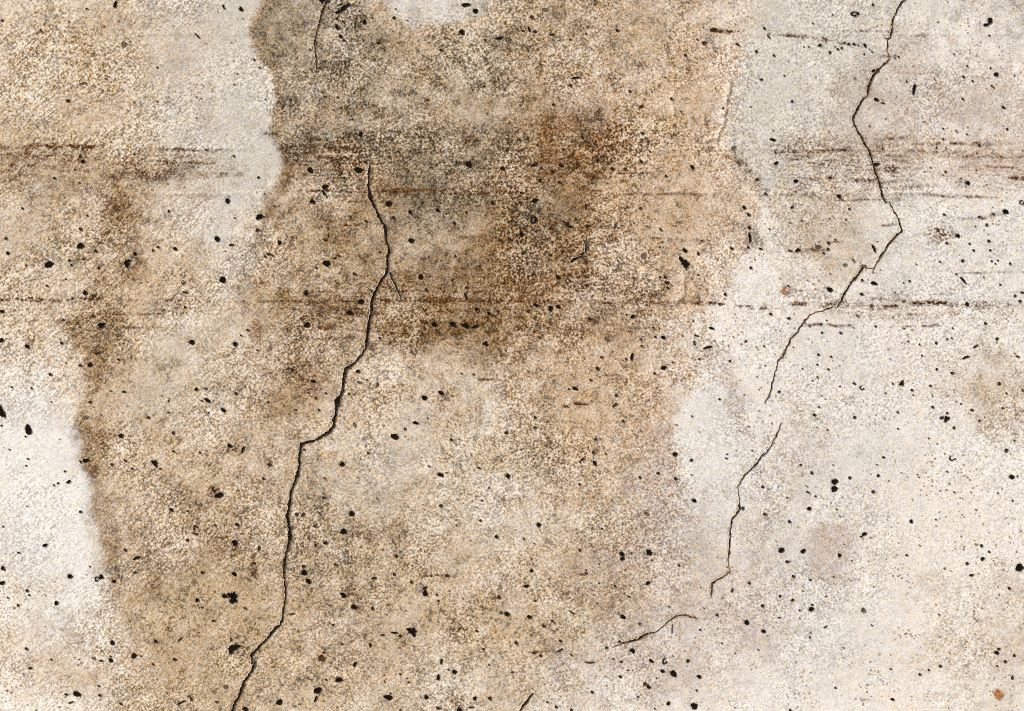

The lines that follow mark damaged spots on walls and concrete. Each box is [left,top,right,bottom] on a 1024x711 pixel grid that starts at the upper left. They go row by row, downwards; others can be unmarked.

crack [764,0,905,403]
leakage [125,669,146,710]
crack [230,163,401,711]
leakage [292,630,418,706]
leakage [0,0,712,677]
leakage [319,521,654,711]
crack [611,422,782,647]